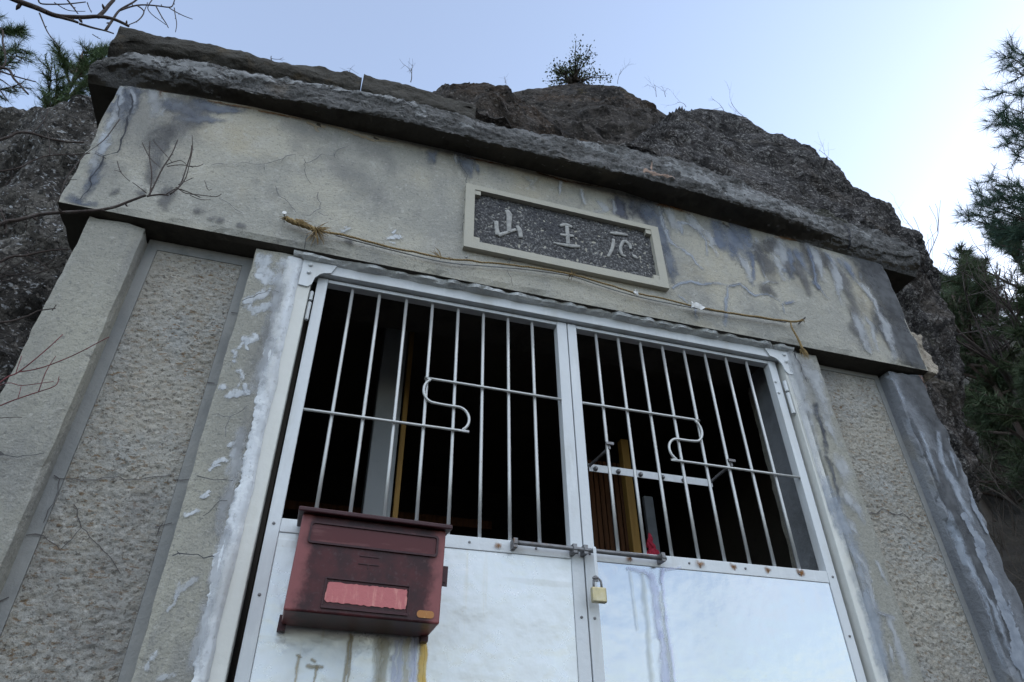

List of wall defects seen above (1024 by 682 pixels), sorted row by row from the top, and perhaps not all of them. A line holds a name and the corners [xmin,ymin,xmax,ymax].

leakage [70,87,241,206]
peeling [218,333,259,398]
peeling [208,441,236,471]
leakage [599,195,1016,673]